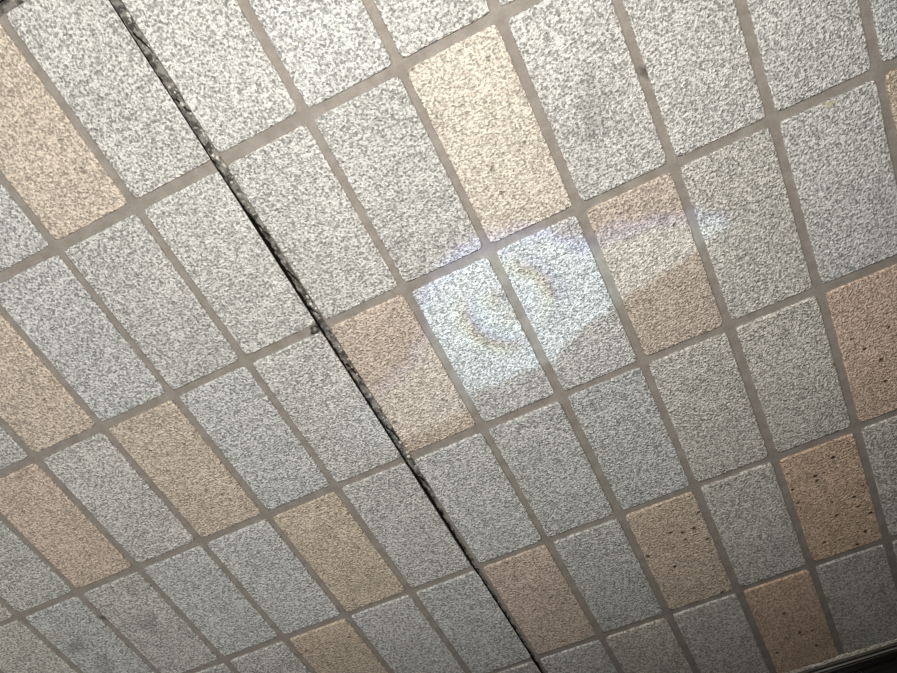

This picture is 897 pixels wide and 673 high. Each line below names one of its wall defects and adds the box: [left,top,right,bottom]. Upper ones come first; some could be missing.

crack [109,0,543,673]